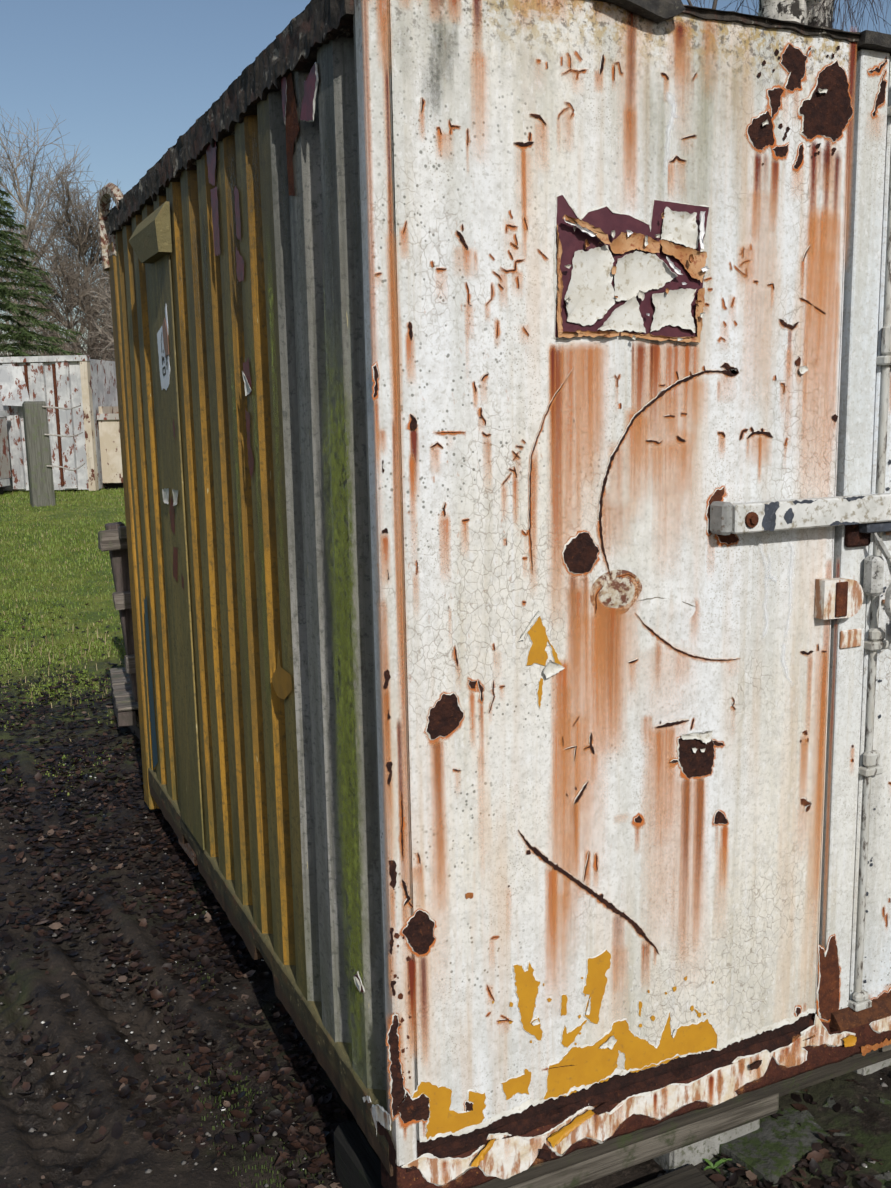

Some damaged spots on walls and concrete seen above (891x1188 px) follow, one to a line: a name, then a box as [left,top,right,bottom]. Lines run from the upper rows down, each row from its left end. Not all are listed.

corrosion [746,31,888,255]
peeling [553,194,710,345]
corrosion [372,74,406,898]
corrosion [550,346,617,710]
water stain [333,417,362,1017]
corrosion [424,678,484,870]
peeling [518,610,564,709]
corrosion [666,729,729,906]
peeling [363,1065,486,1139]
peeling [499,948,718,1100]
corrosion [376,909,841,1173]
peeling [402,1014,857,1186]